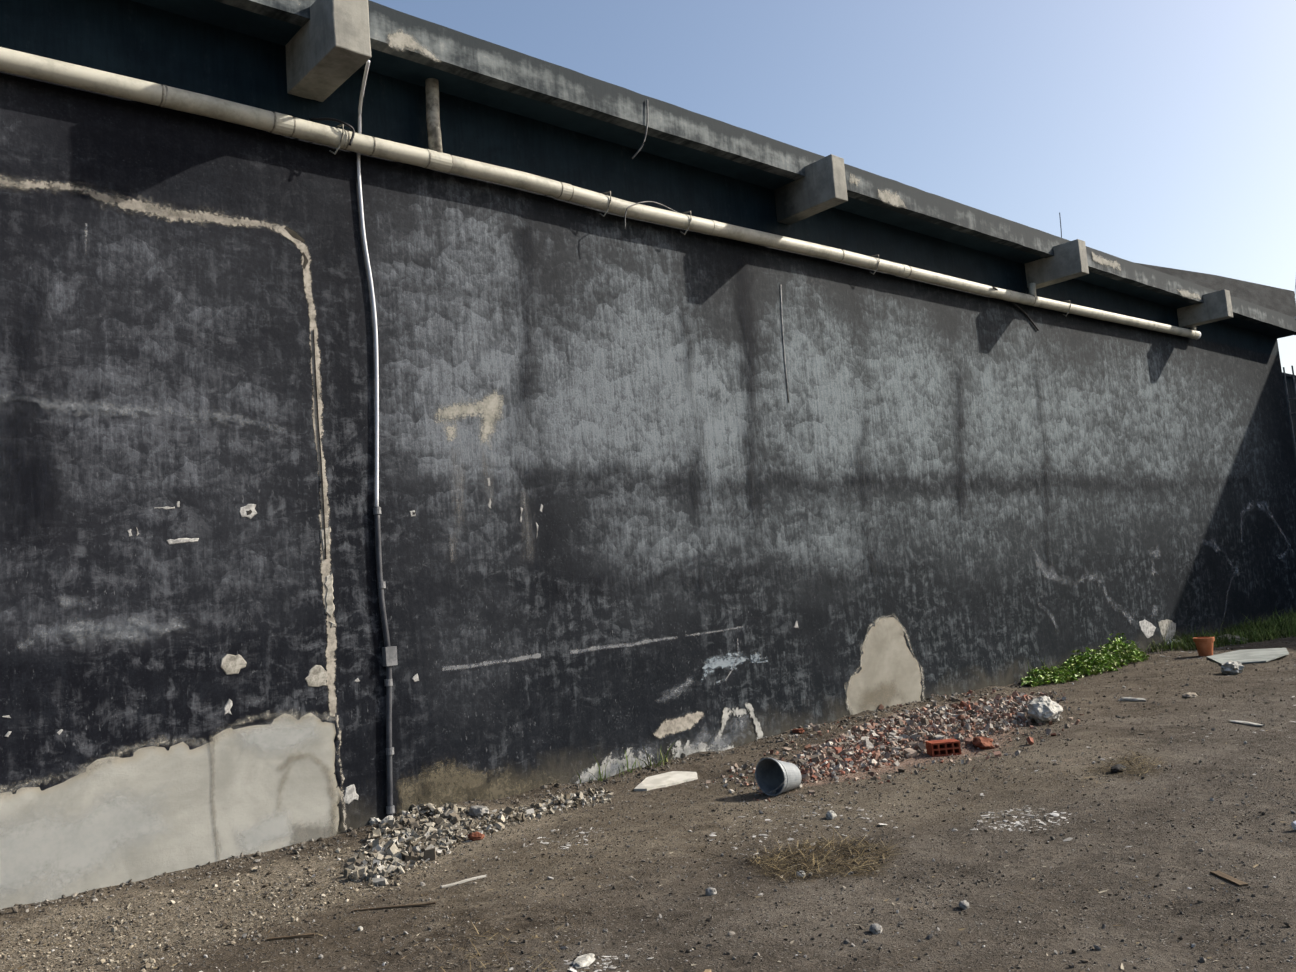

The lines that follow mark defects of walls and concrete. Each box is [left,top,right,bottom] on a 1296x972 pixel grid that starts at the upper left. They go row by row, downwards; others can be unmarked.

flaking render [0,178,337,717]
peeling [574,703,763,784]